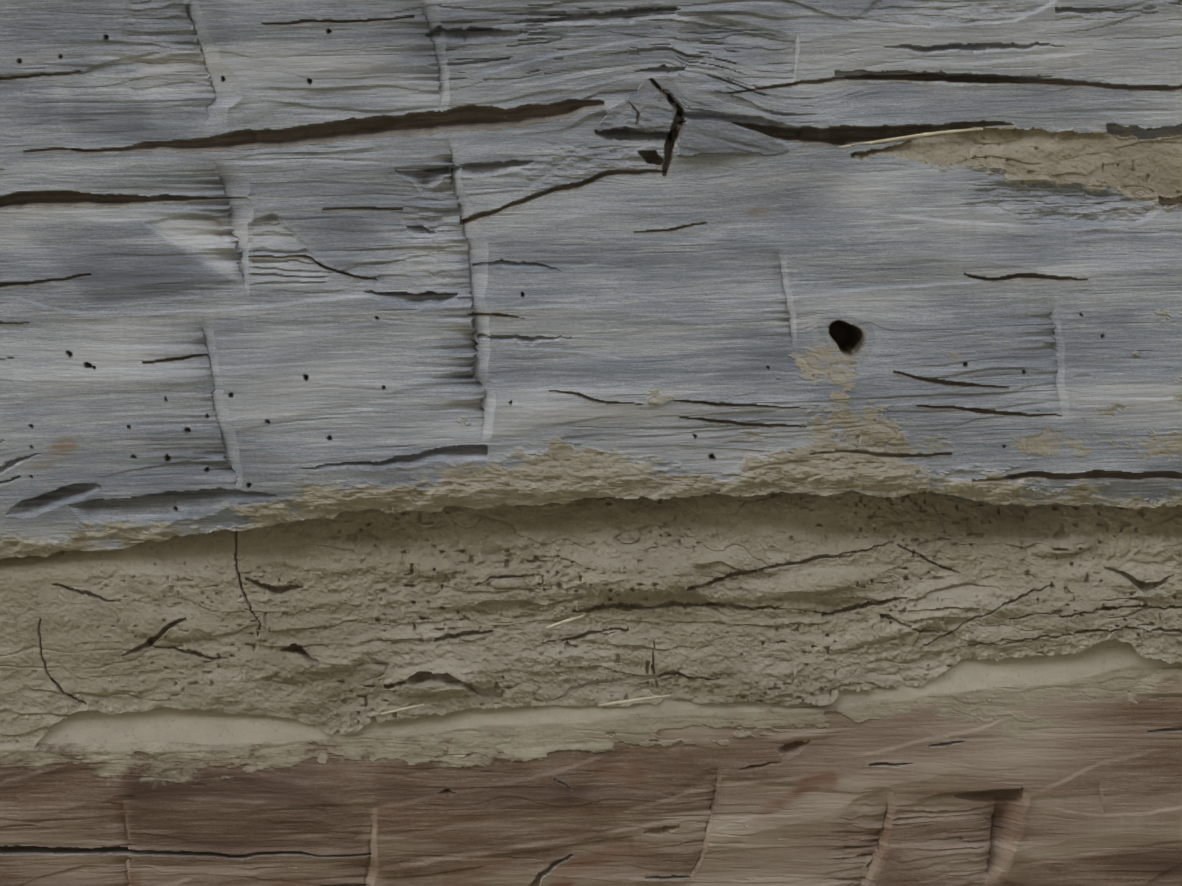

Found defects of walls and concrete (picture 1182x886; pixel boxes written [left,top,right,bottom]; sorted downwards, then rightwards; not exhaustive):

crack [0,79,686,226]
peeling [961,183,1156,224]
crack [0,274,91,288]
crack [249,256,378,281]
crack [0,320,30,328]
crack [468,312,525,320]
crack [122,618,228,662]
peeling [1136,667,1182,696]
peeling [766,728,839,742]
crack [0,845,372,886]